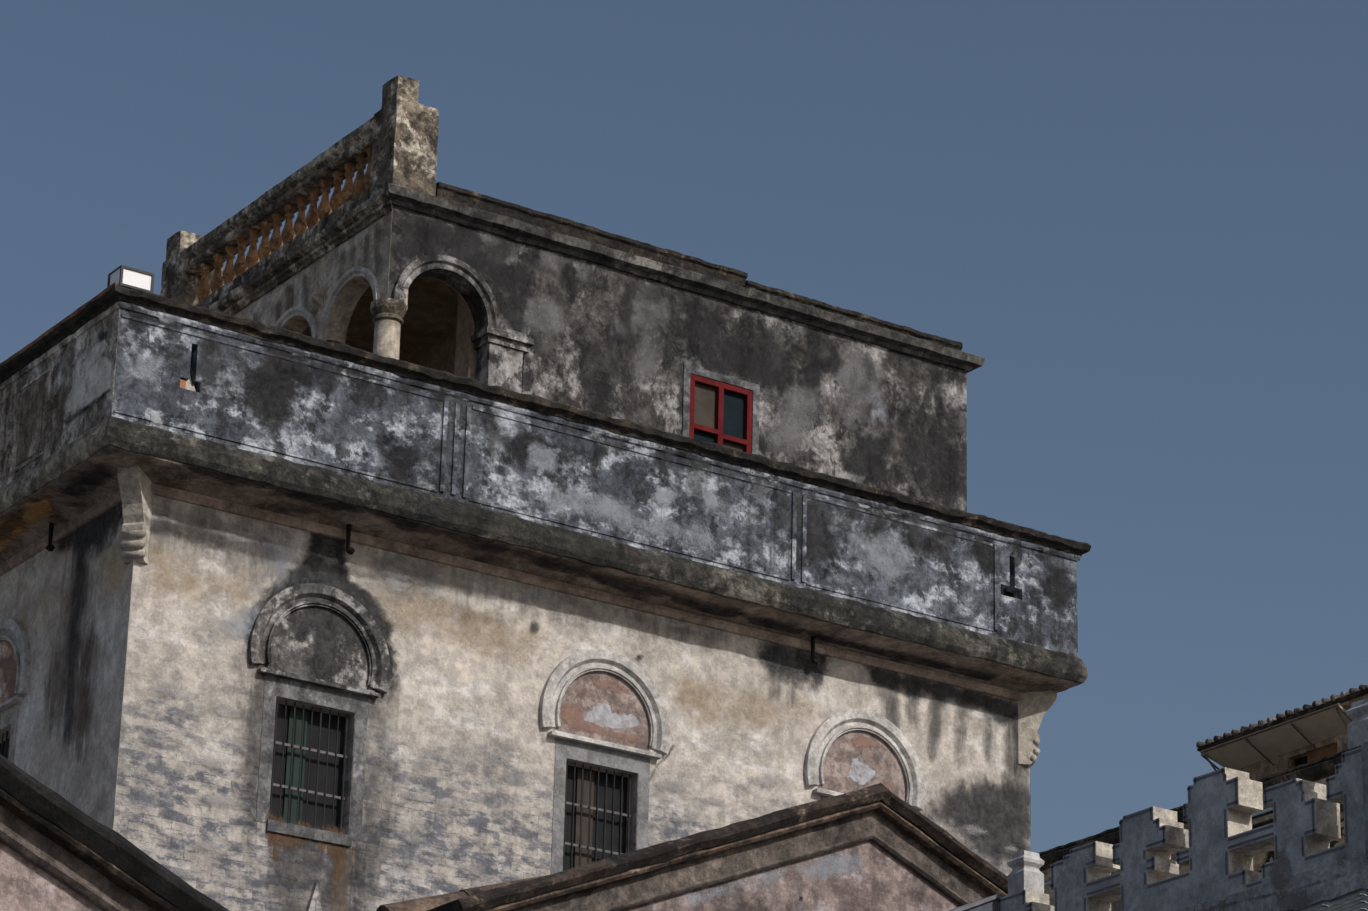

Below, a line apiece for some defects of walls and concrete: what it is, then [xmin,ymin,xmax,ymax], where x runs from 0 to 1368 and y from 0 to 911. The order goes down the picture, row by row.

leakage [682,297,841,388]
leakage [432,389,605,467]
leakage [839,369,960,507]
leakage [796,490,857,575]
leakage [882,508,951,558]
leakage [971,533,1071,609]
leakage [47,502,123,734]
leakage [247,533,474,699]
peeling [0,653,17,698]
peeling [560,680,644,742]
leakage [758,642,829,683]
peeling [847,735,893,792]